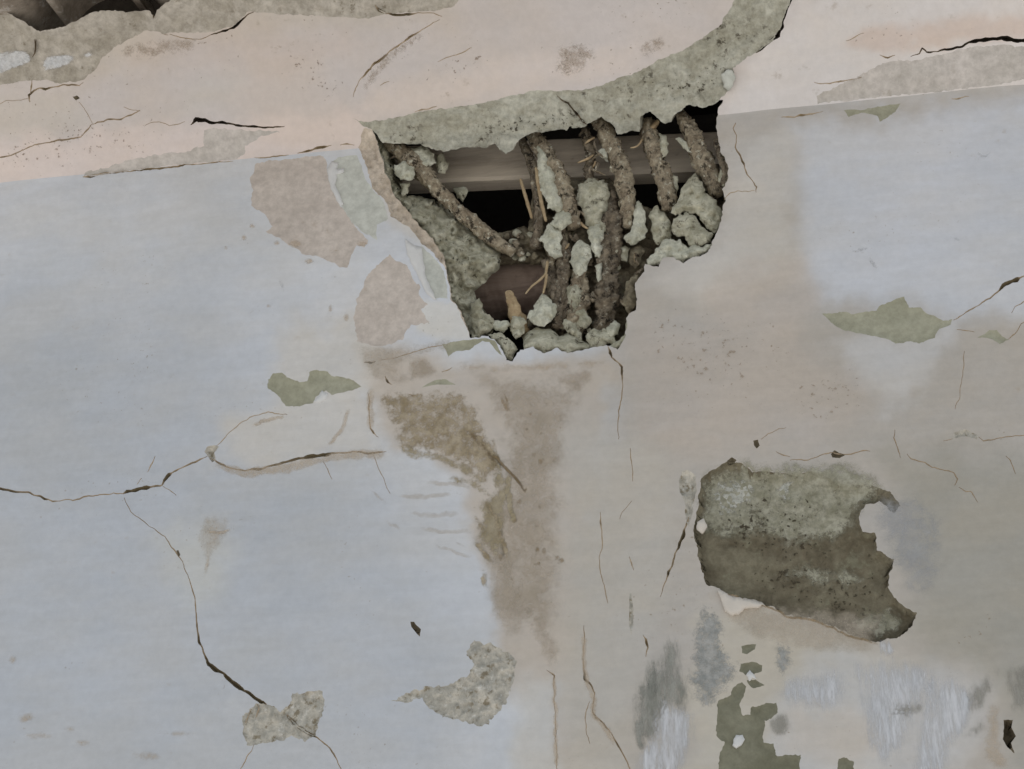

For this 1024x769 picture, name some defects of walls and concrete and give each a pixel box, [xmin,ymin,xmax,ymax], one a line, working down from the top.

crack [0,40,285,158]
crack [880,36,1024,59]
flaking render [250,0,790,360]
peeling [267,370,361,407]
crack [0,345,451,769]
damp [382,387,562,618]
flaking render [679,450,917,642]
flaking render [392,640,517,727]
crack [547,670,558,768]
crack [582,627,630,769]
mould [636,614,734,747]
peeling [716,644,801,769]